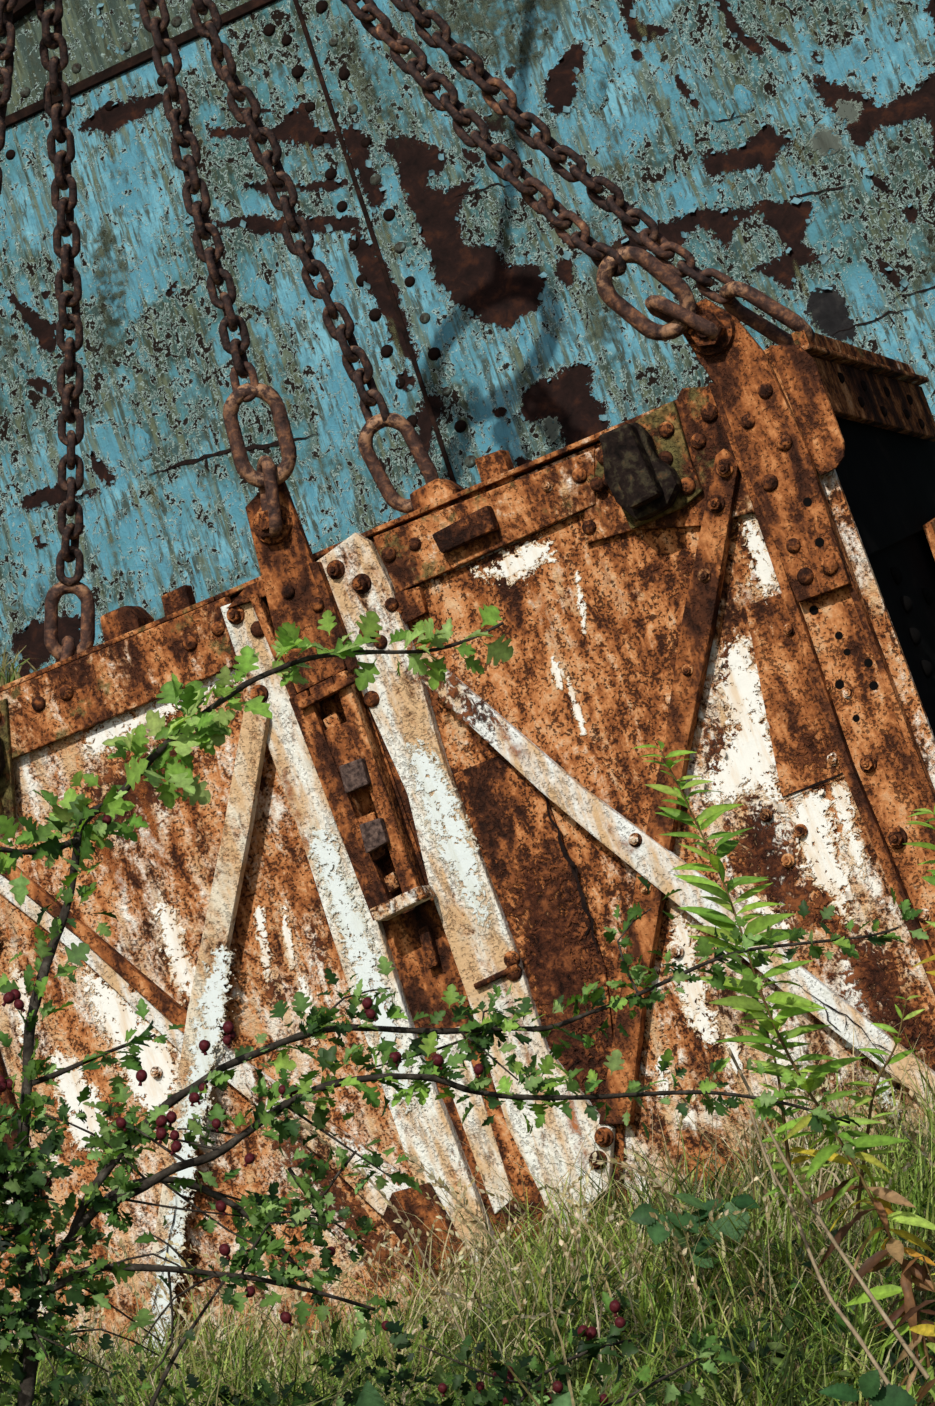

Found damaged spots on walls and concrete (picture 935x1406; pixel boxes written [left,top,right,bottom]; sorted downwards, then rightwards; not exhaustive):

peeling [179,99,579,456]
peeling [609,115,859,346]
peeling [491,360,613,448]
peeling [469,533,557,587]
peeling [737,512,779,605]
rust [72,734,218,889]
rust [400,638,520,755]
rust [693,712,738,788]
peeling [696,634,871,929]
rust [495,835,616,1134]
rust [709,784,935,1063]
rust [250,1118,417,1301]